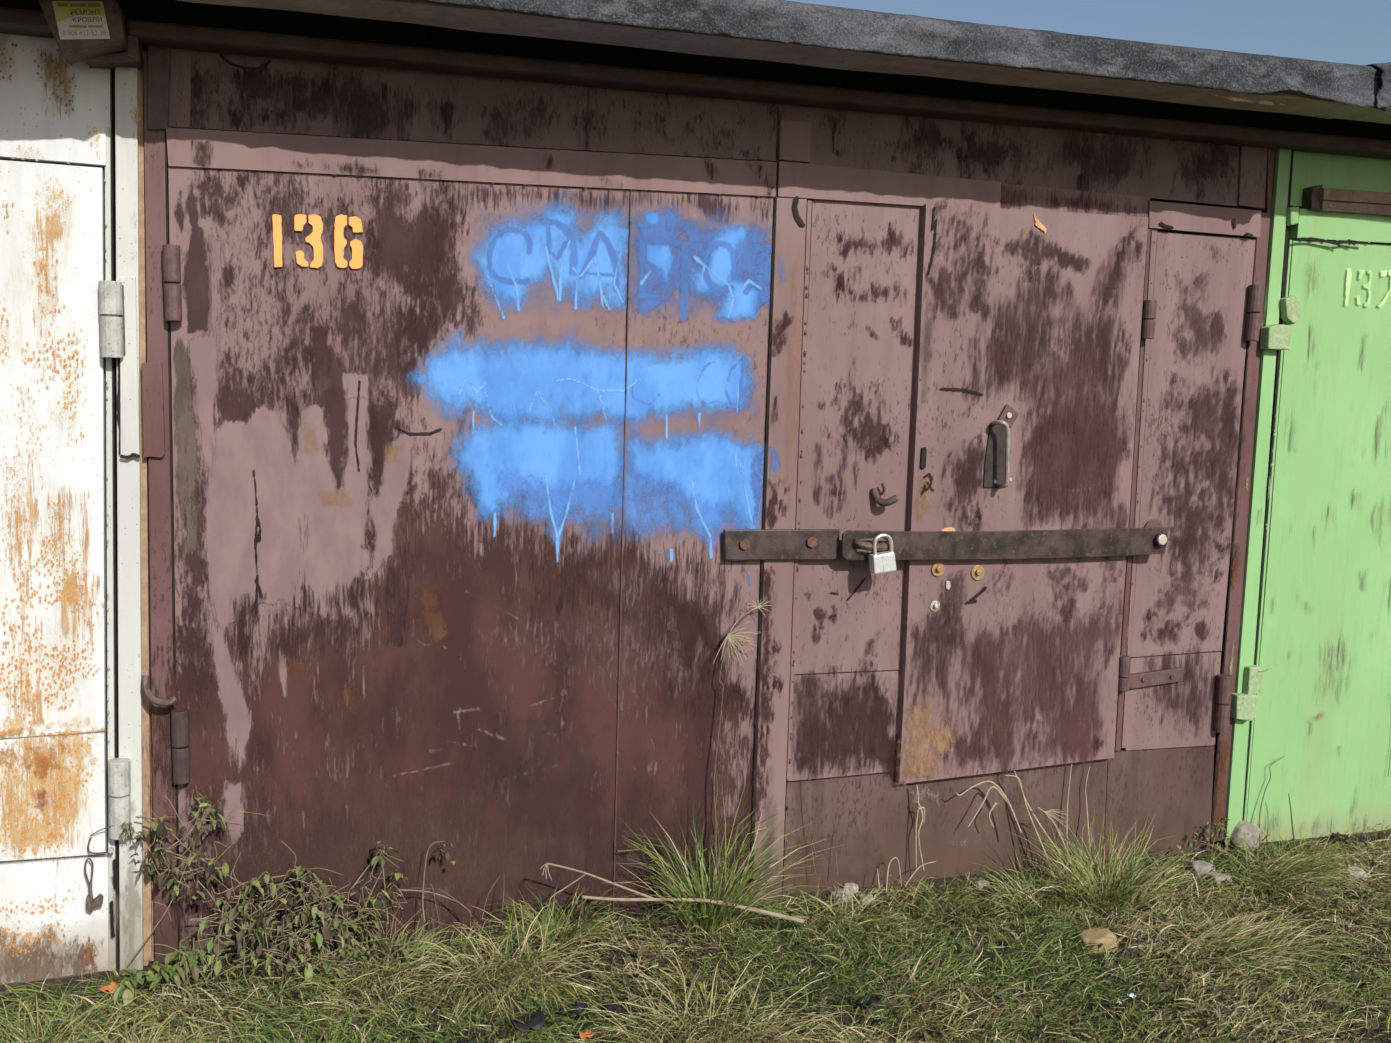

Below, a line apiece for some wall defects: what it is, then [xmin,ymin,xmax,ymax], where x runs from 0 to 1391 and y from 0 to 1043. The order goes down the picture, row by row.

rust [34,49,79,115]
rust [0,177,104,865]
rust [898,697,955,785]
rust [0,890,102,986]